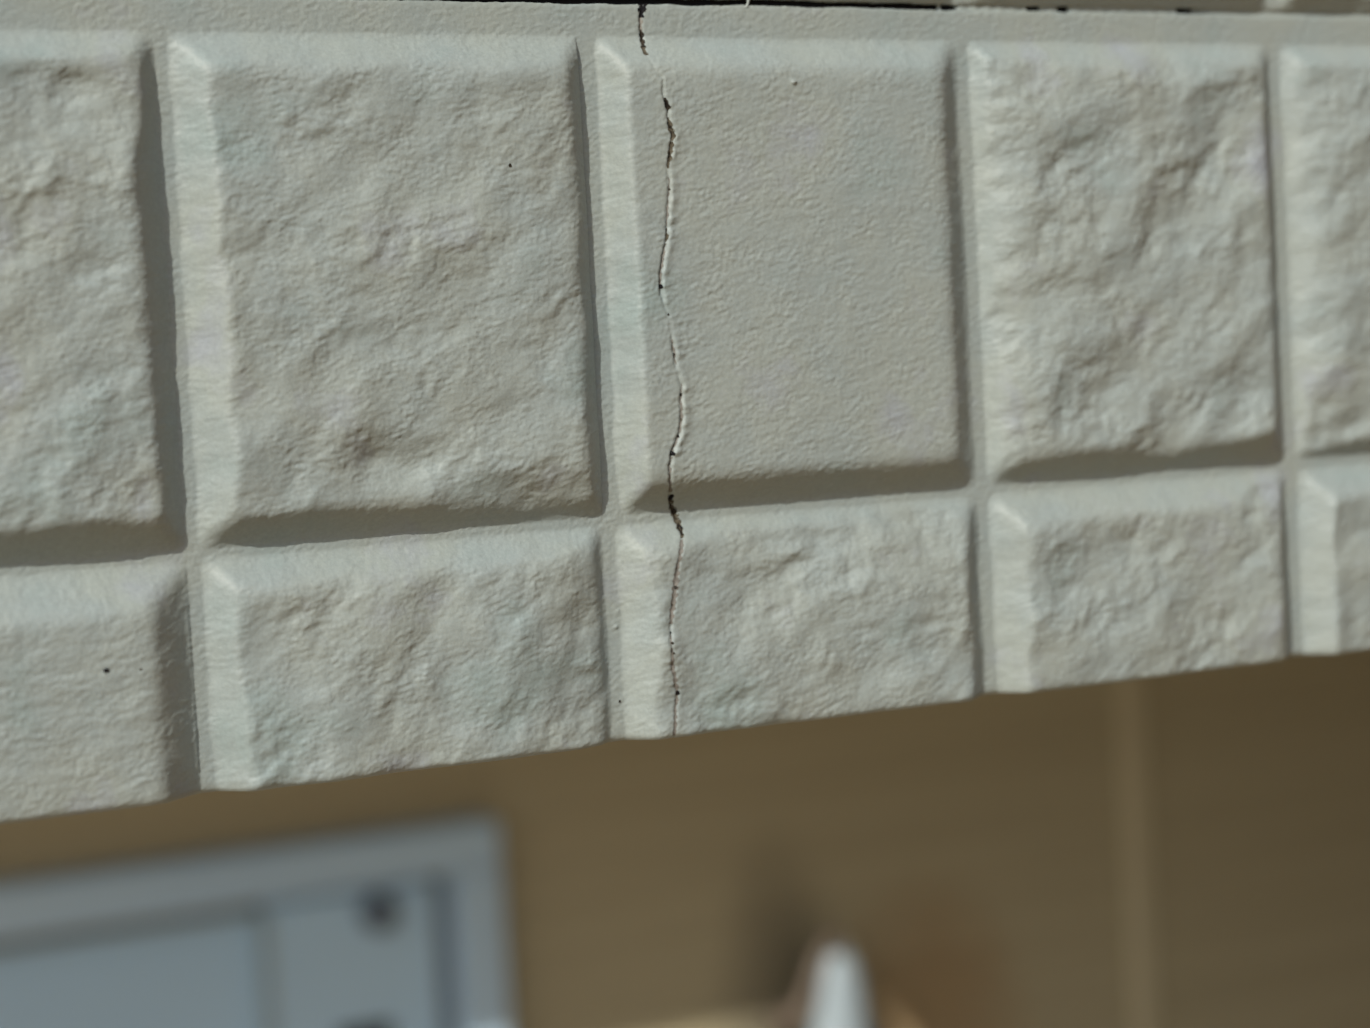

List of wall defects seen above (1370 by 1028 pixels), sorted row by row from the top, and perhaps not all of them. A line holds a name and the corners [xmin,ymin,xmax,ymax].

crack [637,4,648,55]
crack [659,98,684,736]